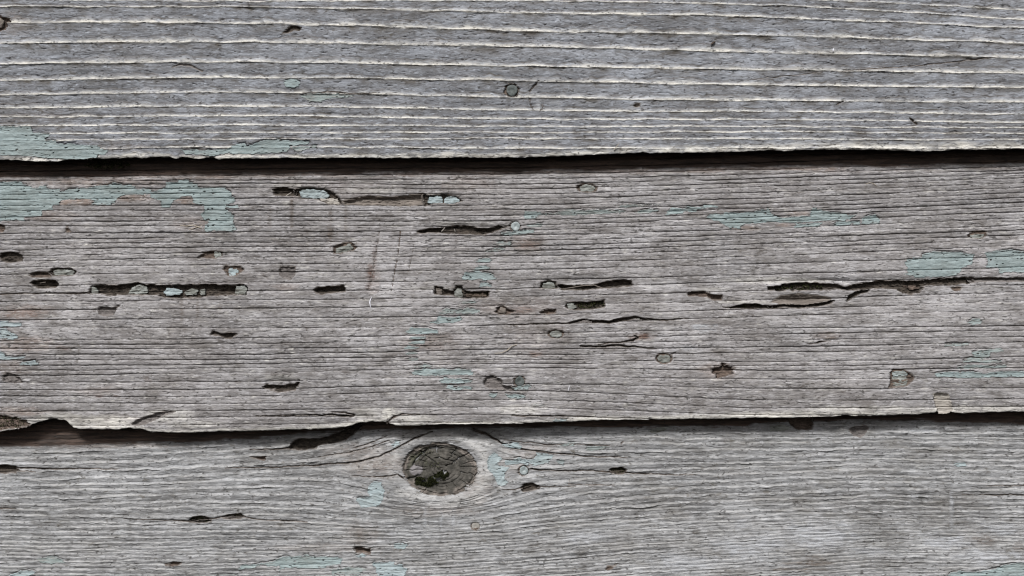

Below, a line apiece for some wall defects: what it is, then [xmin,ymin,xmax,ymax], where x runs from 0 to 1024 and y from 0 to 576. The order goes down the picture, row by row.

peeling [0,126,108,159]
peeling [0,179,239,233]
crack [416,225,508,235]
crack [539,279,633,291]
crack [767,277,1024,302]
peeling [904,249,1024,291]
crack [509,291,723,356]